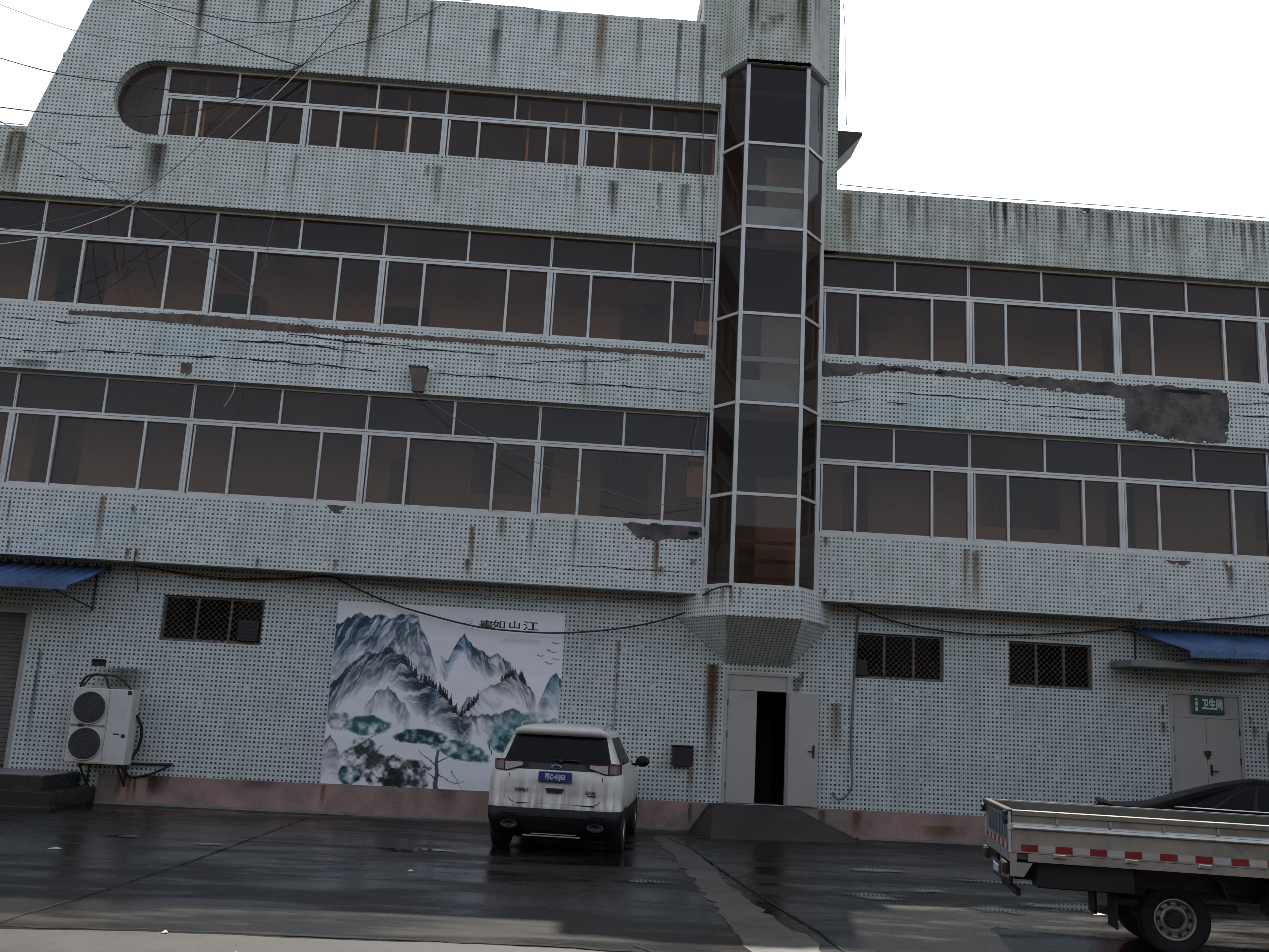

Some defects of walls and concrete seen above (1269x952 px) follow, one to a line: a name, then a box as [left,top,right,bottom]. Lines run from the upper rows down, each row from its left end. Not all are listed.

water stain [368,0,379,45]
peeling [822,361,1231,446]
peeling [622,522,703,543]